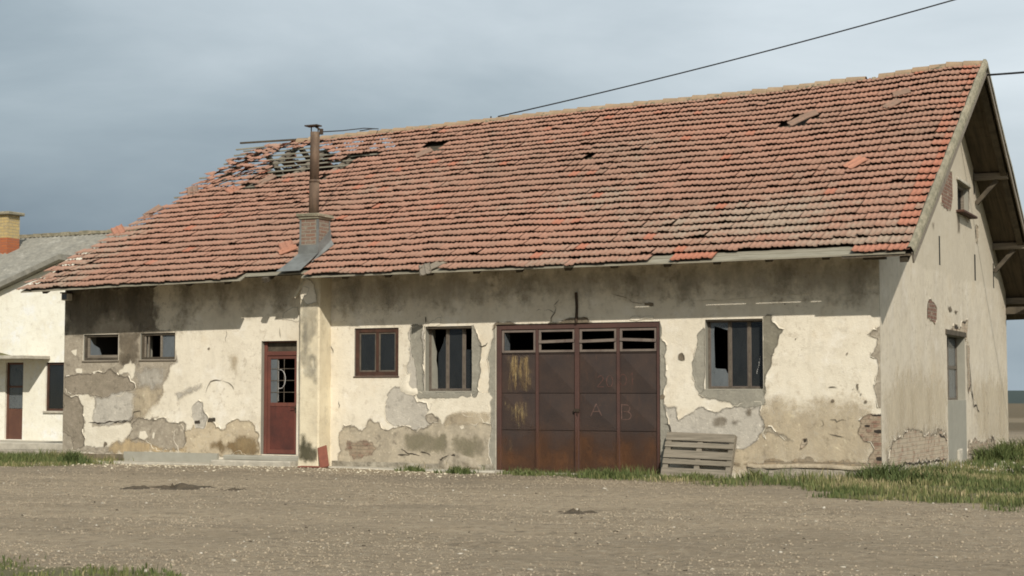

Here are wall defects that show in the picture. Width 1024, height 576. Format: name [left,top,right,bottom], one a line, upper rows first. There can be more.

flaking render [62,286,261,457]
flaking render [338,323,492,465]
flaking render [663,327,948,470]
flaking render [928,298,971,392]